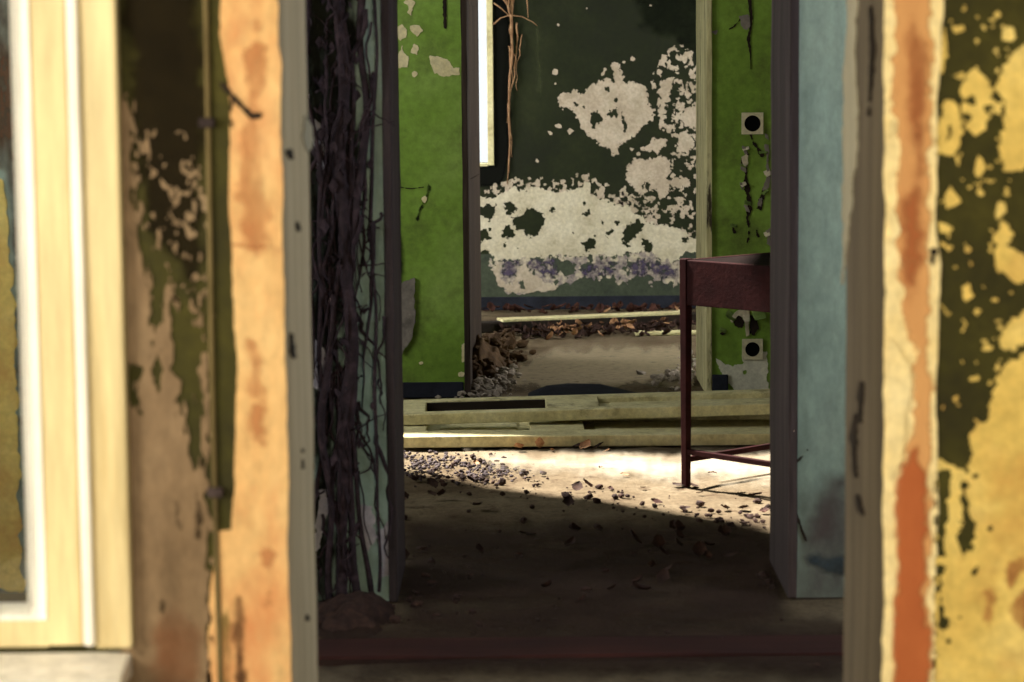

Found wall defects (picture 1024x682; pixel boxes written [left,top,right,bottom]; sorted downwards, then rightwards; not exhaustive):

peeling [398,0,460,77]
crack [729,0,753,69]
flaking render [480,45,696,295]
peeling [740,133,771,212]
flaking render [120,0,292,682]
flaking render [716,352,769,390]
peeling [720,310,767,336]
flaking render [881,0,1024,682]